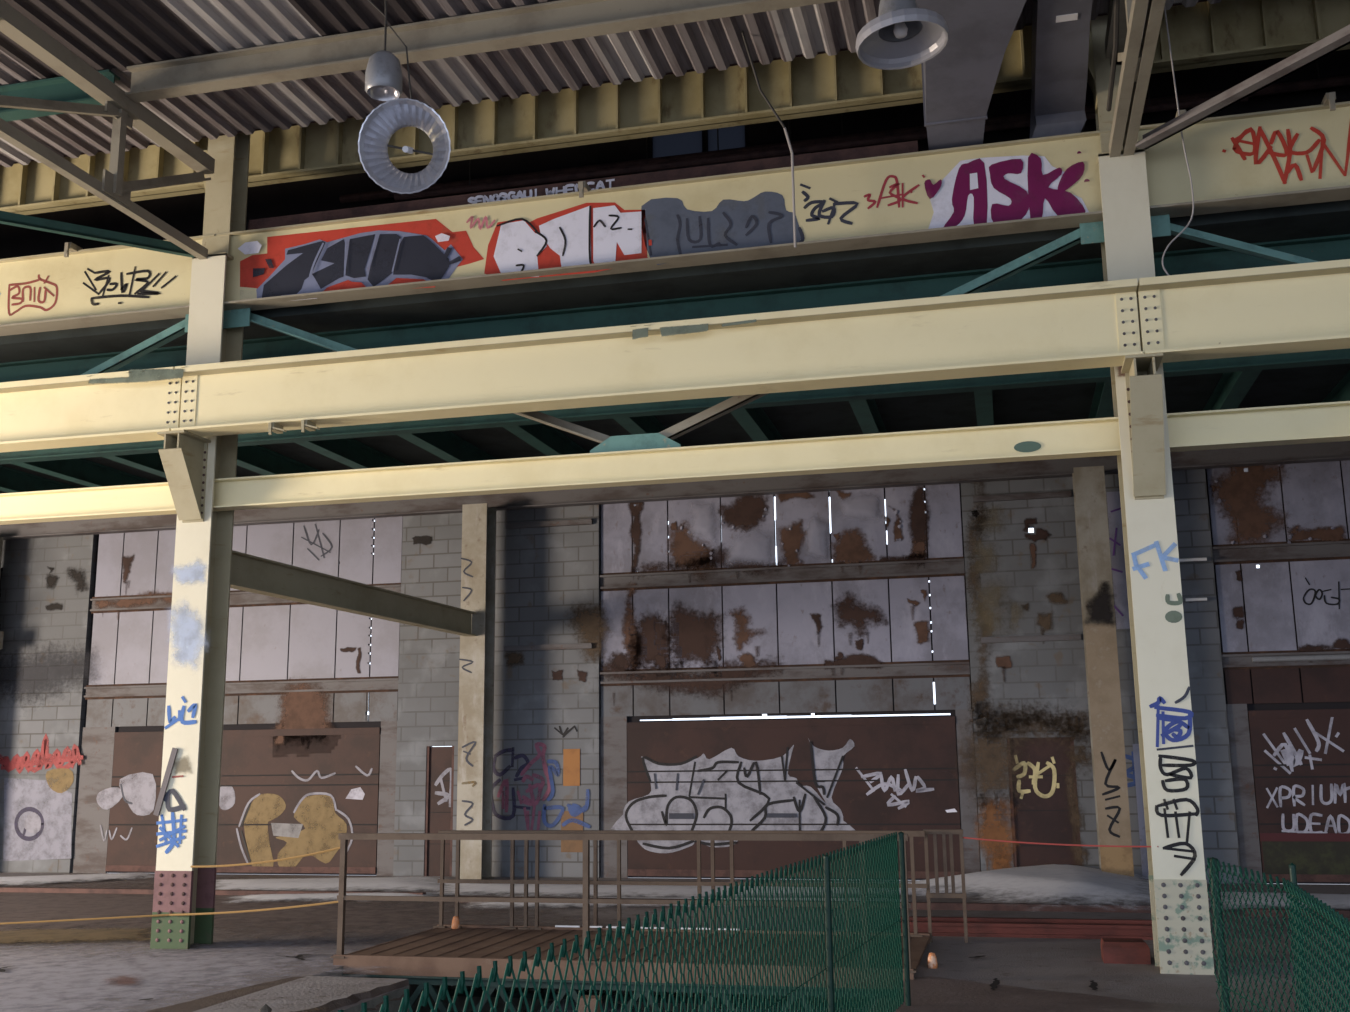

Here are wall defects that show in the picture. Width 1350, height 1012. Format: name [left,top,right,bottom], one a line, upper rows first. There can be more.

rust [832,486,929,567]
rust [600,502,783,696]
rust [810,593,888,669]
rust [907,590,930,644]
rust [274,679,331,745]
rust [960,482,1090,870]
damp [978,705,1090,738]